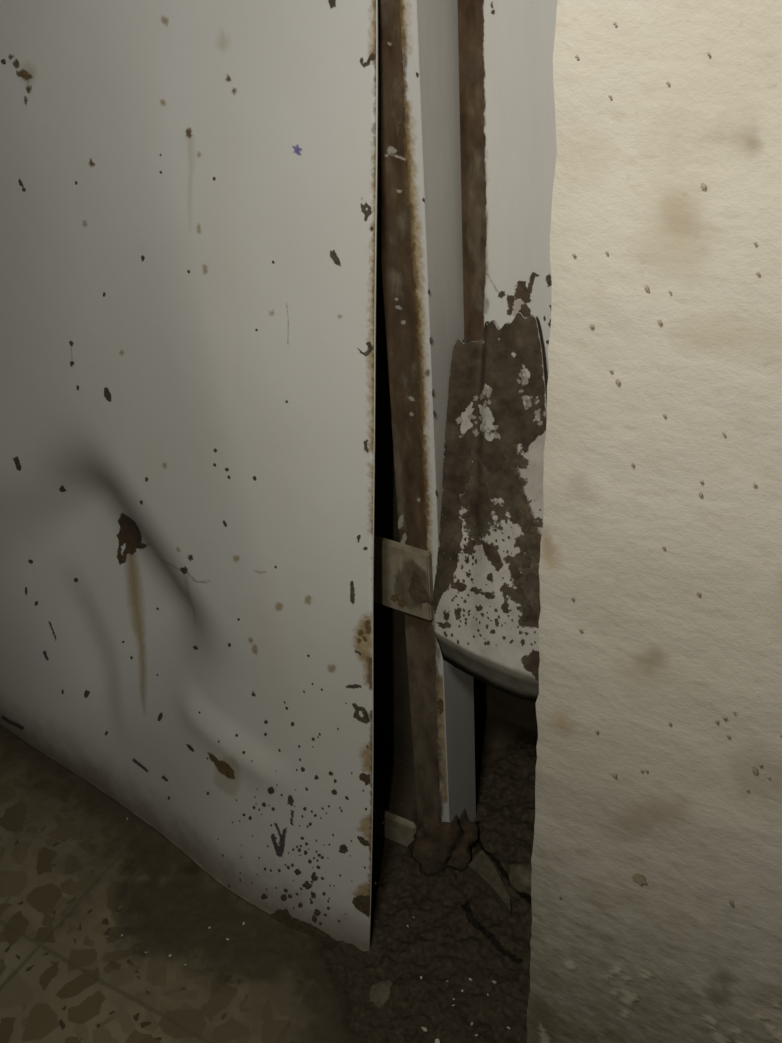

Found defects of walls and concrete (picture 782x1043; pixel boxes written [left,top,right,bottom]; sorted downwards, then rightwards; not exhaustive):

corrosion [370,0,552,823]
corrosion [116,513,147,648]
peeling [436,506,541,647]
corrosion [354,617,372,689]
peeling [228,733,378,931]